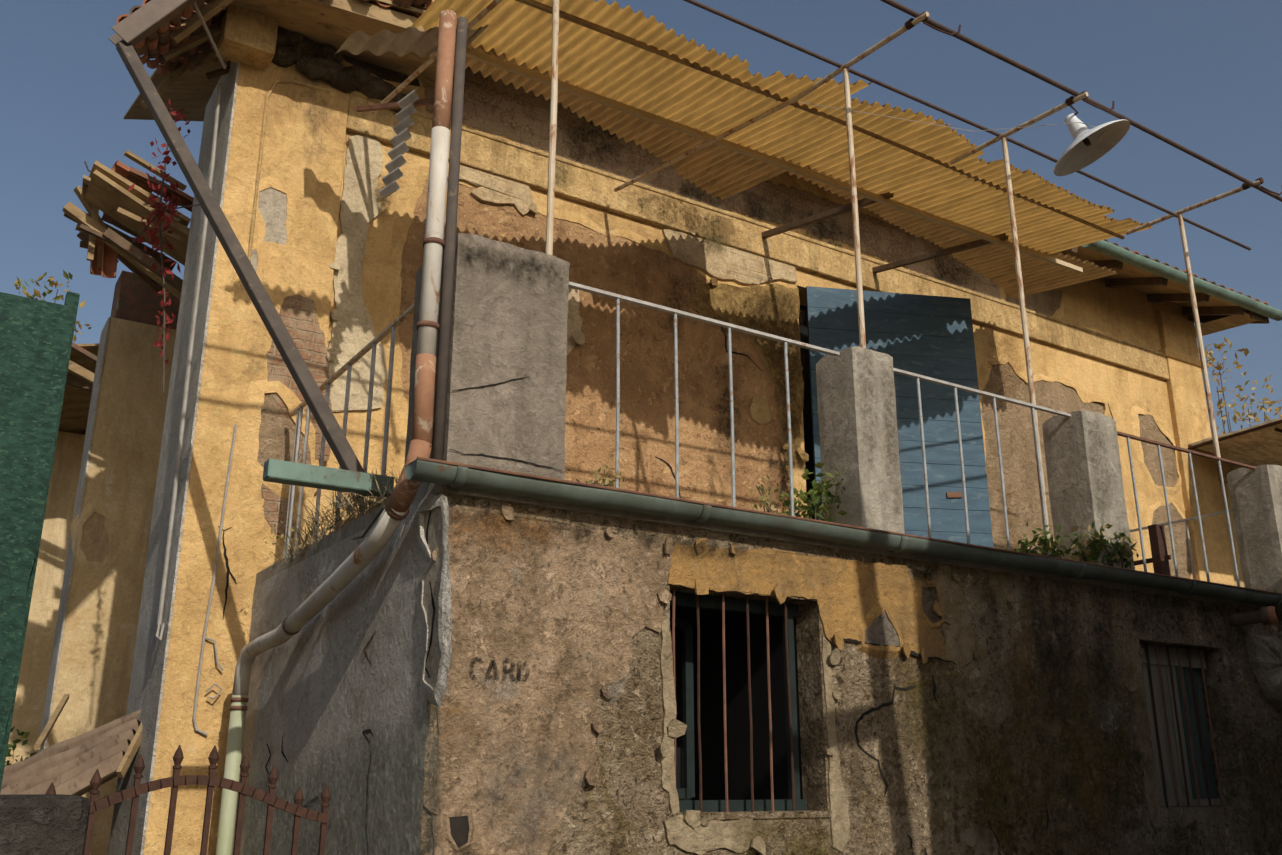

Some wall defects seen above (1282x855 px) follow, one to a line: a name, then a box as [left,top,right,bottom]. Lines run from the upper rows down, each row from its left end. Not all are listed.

crack [218,526,237,619]
spalling [242,340,331,538]
peeling [279,135,429,417]
crack [453,376,530,391]
crack [449,449,567,473]
spalling [443,162,809,516]
spalling [451,66,1067,320]
spalling [977,354,1110,555]
spalling [1129,406,1193,579]
peeling [418,493,987,855]
crack [843,638,957,797]
damp [914,586,1144,855]